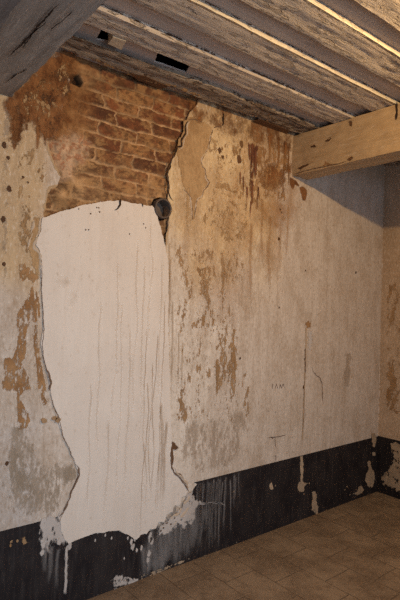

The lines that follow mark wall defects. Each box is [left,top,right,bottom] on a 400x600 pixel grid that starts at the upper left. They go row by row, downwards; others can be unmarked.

leakage [190,96,237,134]
crack [167,113,224,199]
leakage [250,119,292,191]
spalling [2,56,307,512]
spalling [159,442,201,535]
spalling [298,456,310,495]
spalling [353,433,400,495]